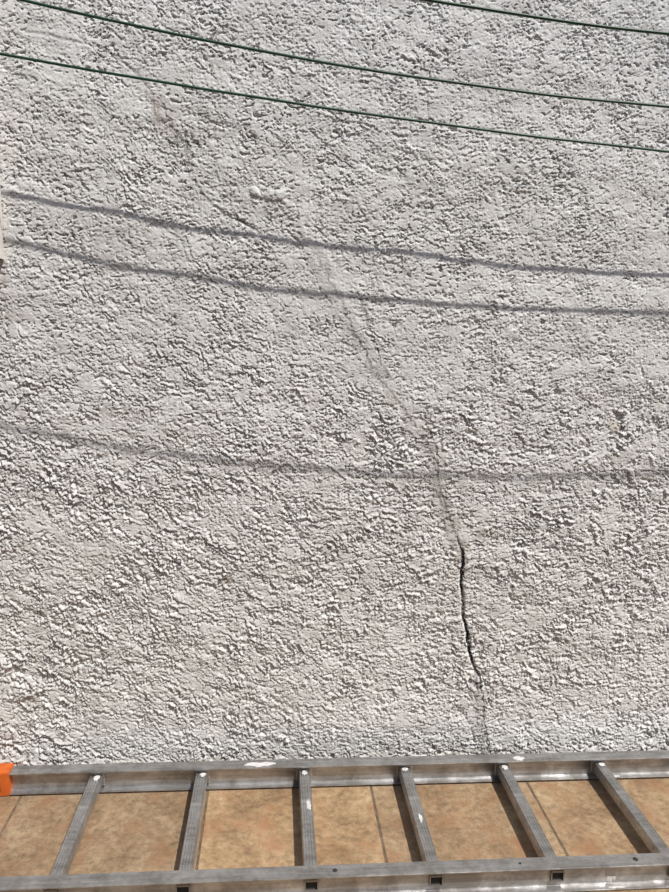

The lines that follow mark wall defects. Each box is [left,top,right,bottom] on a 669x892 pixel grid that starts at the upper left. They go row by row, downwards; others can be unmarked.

crack [318,258,498,754]